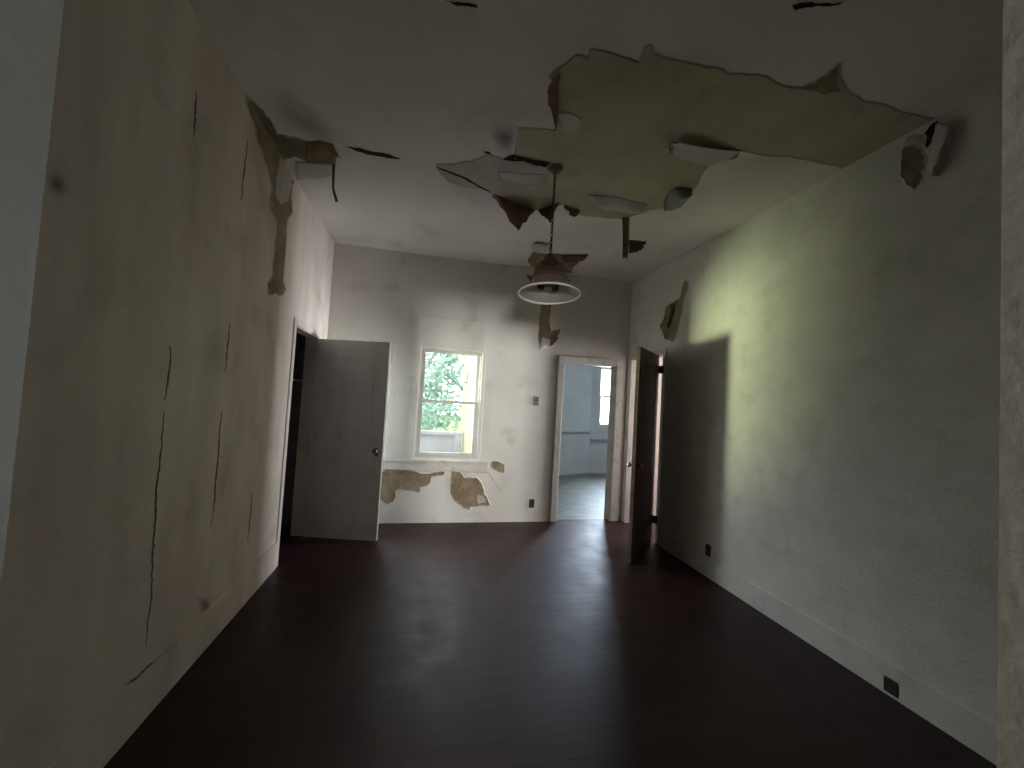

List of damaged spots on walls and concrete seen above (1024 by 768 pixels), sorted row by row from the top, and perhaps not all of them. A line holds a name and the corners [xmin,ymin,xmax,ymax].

crack [191,92,199,135]
crack [240,139,248,200]
peeling [243,95,340,297]
crack [348,147,400,159]
peeling [436,43,954,260]
peeling [525,243,589,282]
crack [223,323,231,373]
peeling [538,304,560,349]
peeling [659,280,689,342]
crack [210,411,222,528]
flaking render [380,460,505,510]
crack [126,346,171,686]